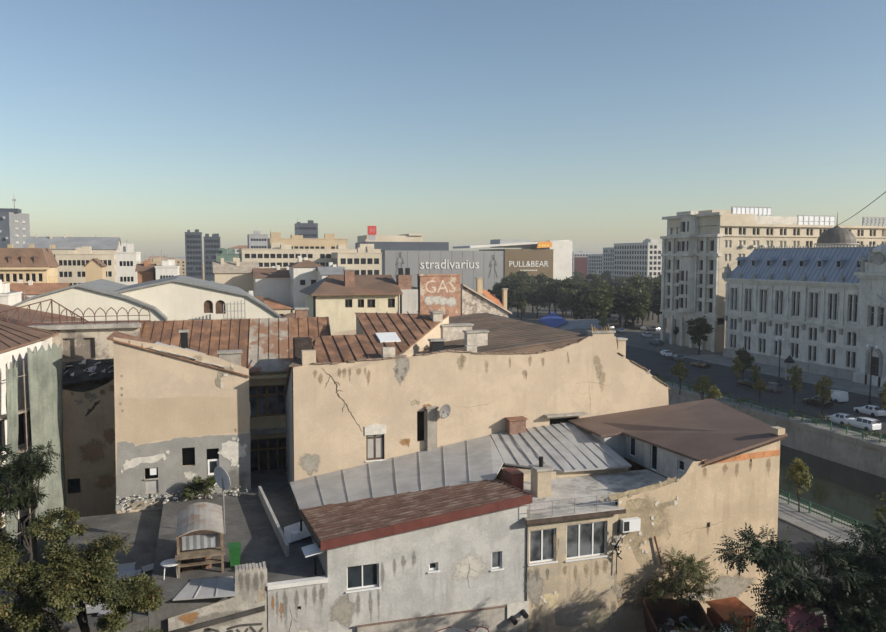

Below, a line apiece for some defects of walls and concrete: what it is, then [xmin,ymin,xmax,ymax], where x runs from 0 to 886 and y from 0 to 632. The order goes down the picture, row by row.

crack [322,368,361,430]
flaking render [81,430,115,460]
peeling [97,450,170,489]
peeling [218,437,247,467]